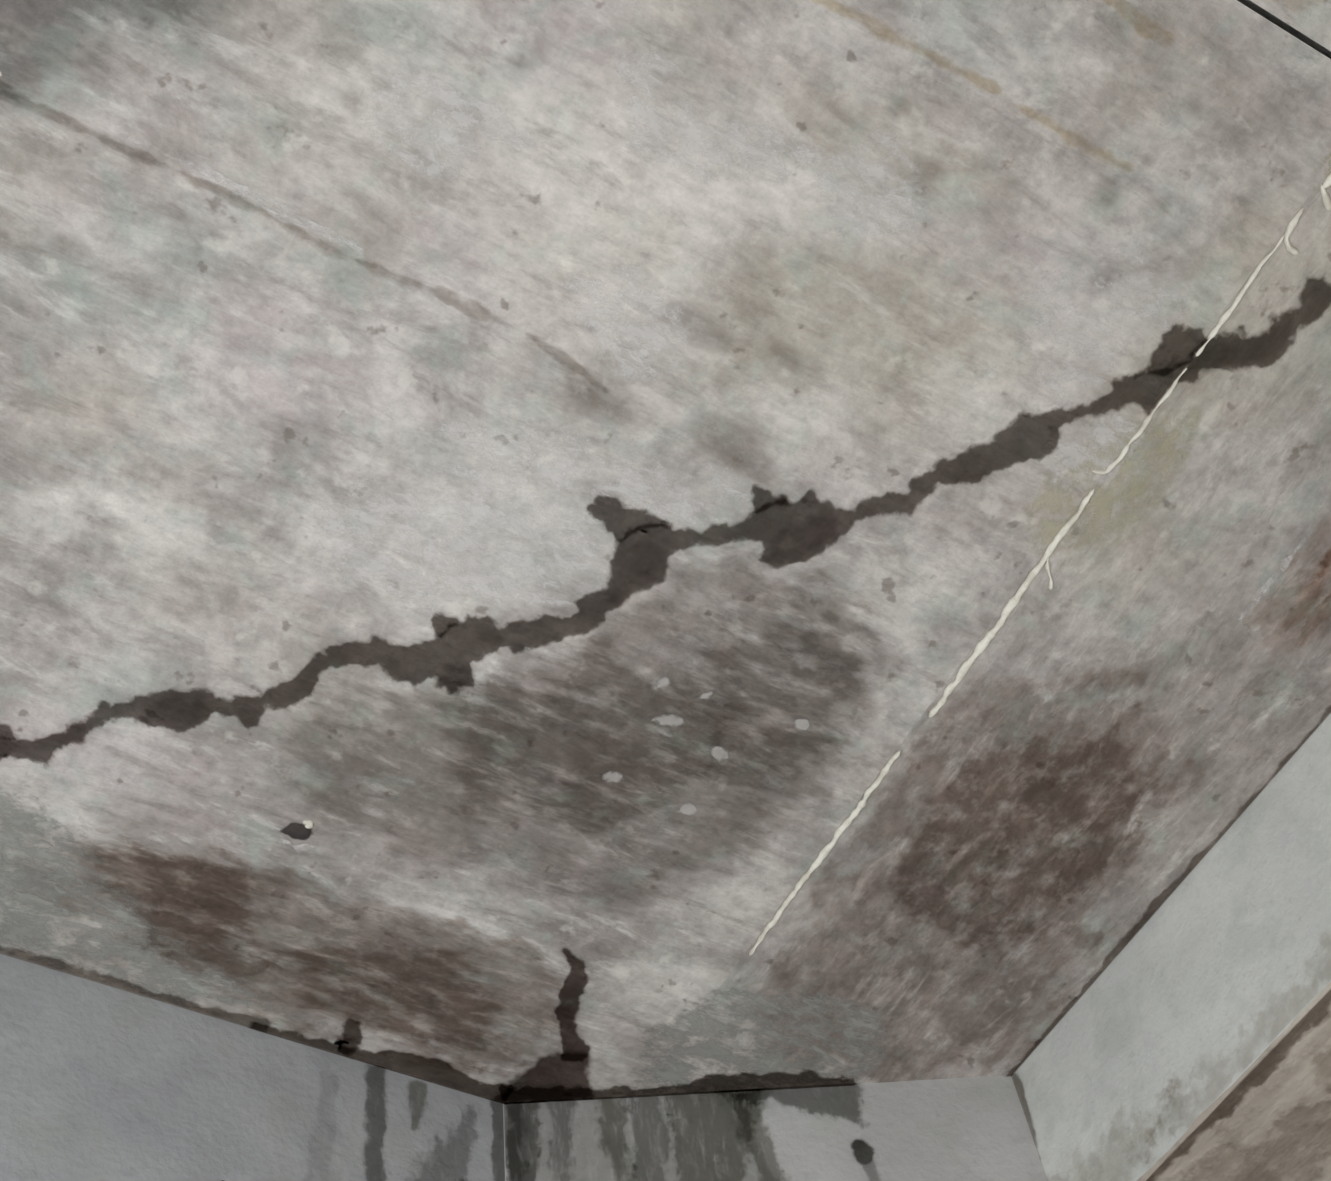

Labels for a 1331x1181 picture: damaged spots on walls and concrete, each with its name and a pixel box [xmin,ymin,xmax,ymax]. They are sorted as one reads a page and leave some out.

crack [0,279,1331,763]
damp [656,716,683,725]
damp [795,719,809,730]
damp [712,747,727,759]
damp [605,773,621,782]
damp [680,805,696,814]
crack [250,949,855,1105]